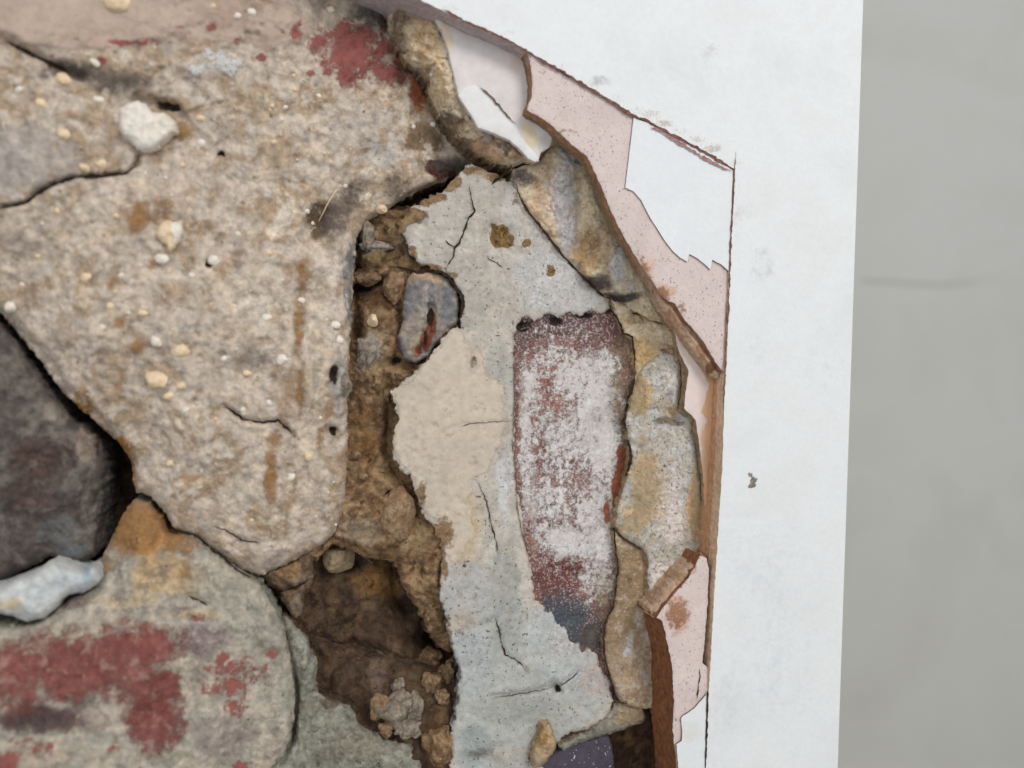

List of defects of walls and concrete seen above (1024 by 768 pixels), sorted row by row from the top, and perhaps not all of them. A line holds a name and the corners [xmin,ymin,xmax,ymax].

peeling [435,19,571,163]
crack [0,158,139,209]
spalling [490,224,531,248]
crack [358,166,693,476]
flaking render [641,259,720,380]
crack [228,408,292,434]
peeling [577,402,625,497]
peeling [545,519,616,568]
flaking render [638,550,708,629]
peeling [126,669,188,758]
peeling [196,649,280,719]
crack [496,621,577,697]